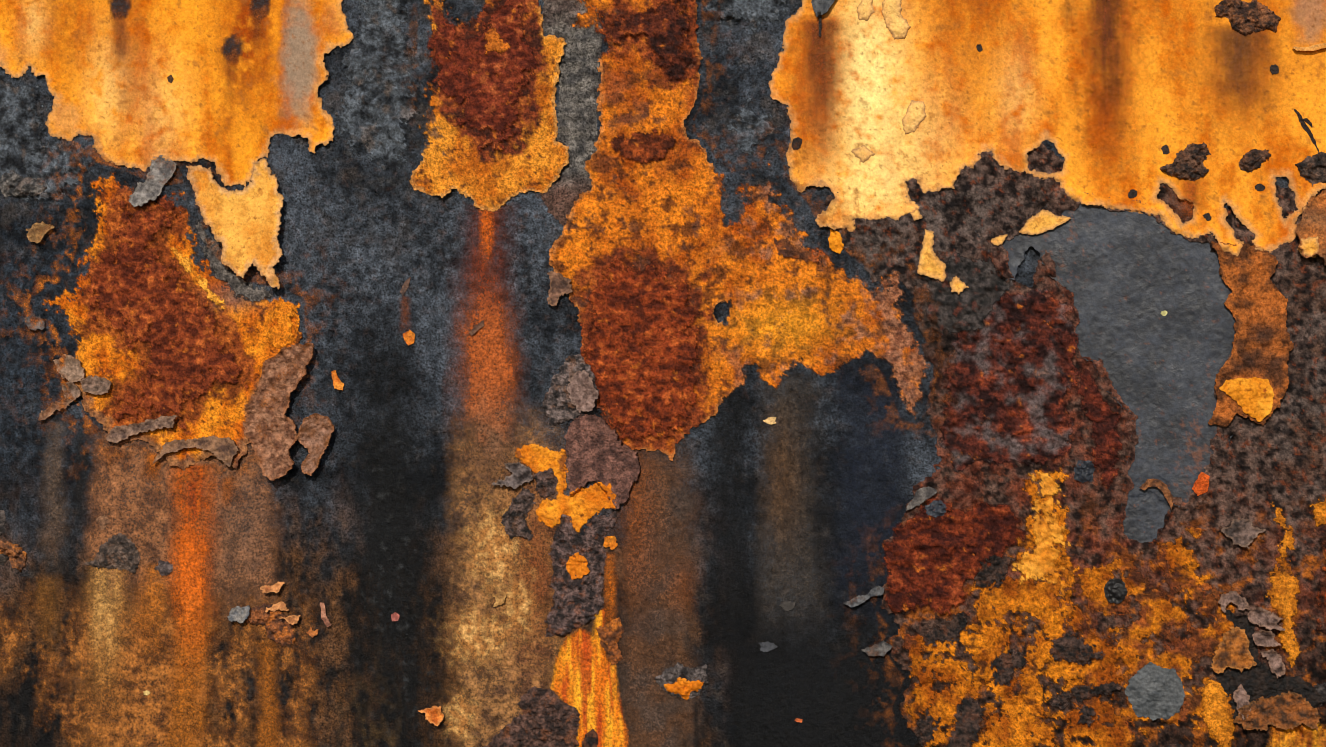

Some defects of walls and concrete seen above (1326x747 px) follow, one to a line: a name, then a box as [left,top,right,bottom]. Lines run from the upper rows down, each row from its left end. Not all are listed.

rust [110,0,130,49]
peeling [0,0,354,302]
rust [223,35,243,61]
rust [250,0,269,27]
peeling [768,0,1326,294]
rust [0,618,27,673]
rust [22,157,335,747]
leakage [353,361,440,747]
spalling [582,729,598,747]
leakage [710,382,914,747]
rust [409,0,1326,747]